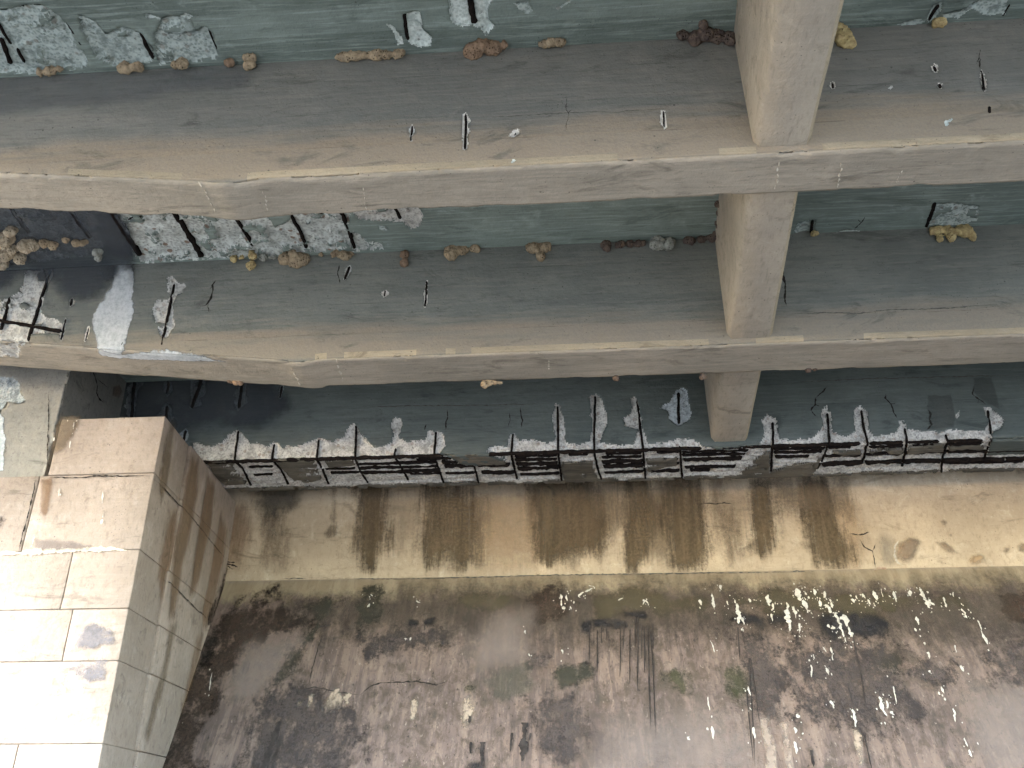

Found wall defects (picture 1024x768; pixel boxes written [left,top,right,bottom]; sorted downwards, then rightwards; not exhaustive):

spalling [0,4,218,75]
water stain [0,208,134,299]
spalling [109,207,424,264]
spalling [925,202,979,227]
spalling [0,273,74,358]
spalling [152,276,186,345]
spalling [179,388,1024,492]
water stain [163,476,1024,768]